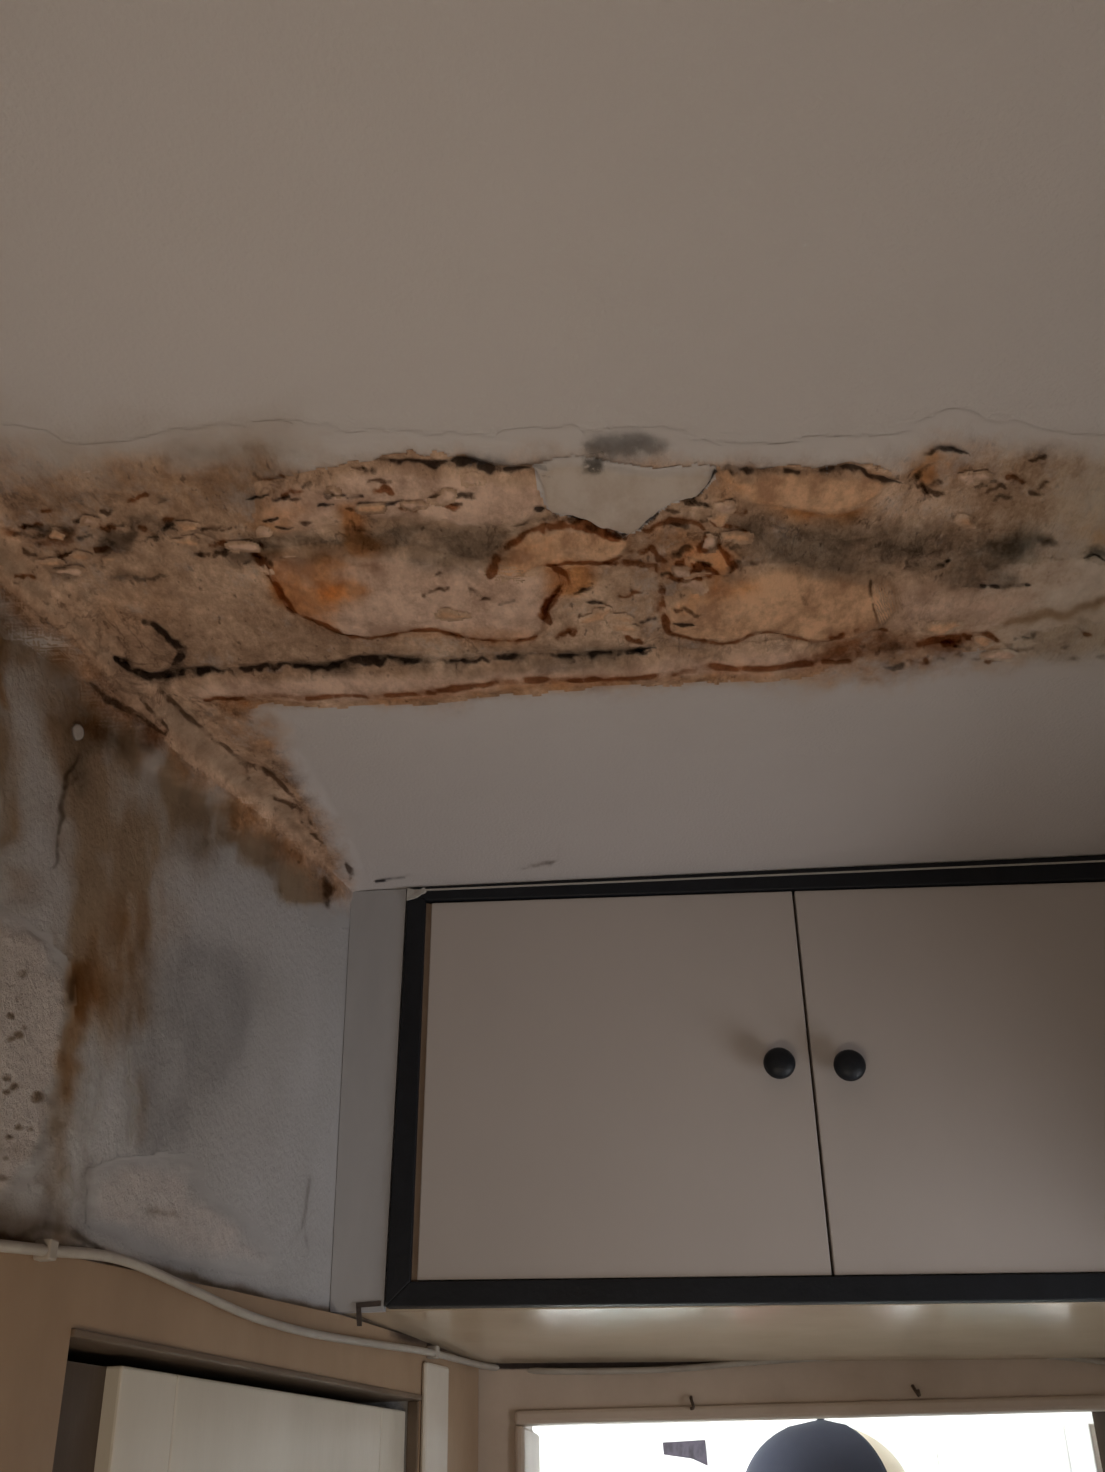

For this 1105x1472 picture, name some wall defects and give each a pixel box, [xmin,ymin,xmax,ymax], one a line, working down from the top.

flaking render [0,408,1105,933]